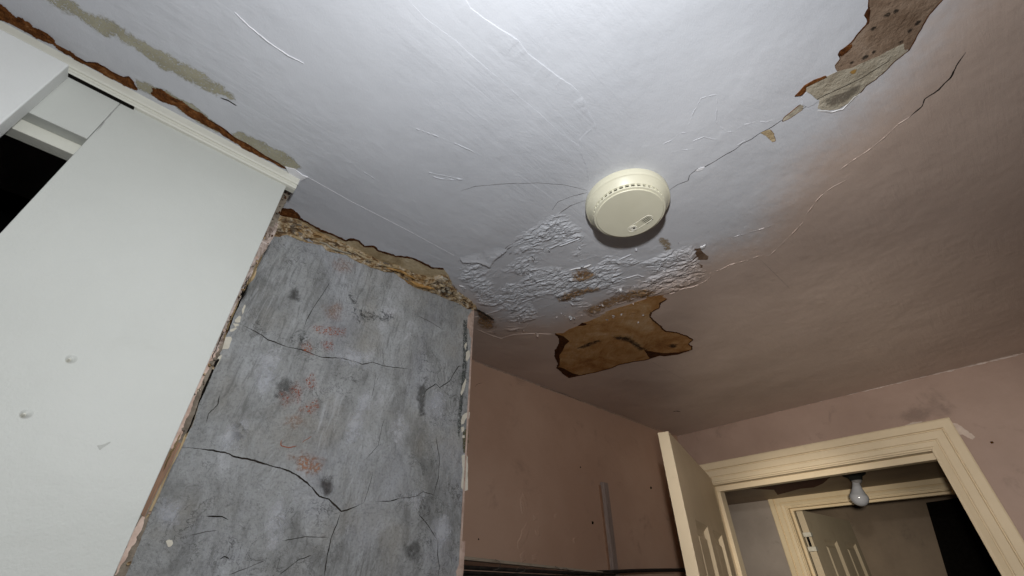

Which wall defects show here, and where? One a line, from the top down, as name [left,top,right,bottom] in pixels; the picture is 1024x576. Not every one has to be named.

leakage [50,0,233,100]
peeling [782,0,942,122]
crack [911,55,964,116]
crack [243,325,407,398]
peeling [114,190,709,576]
crack [187,421,440,576]